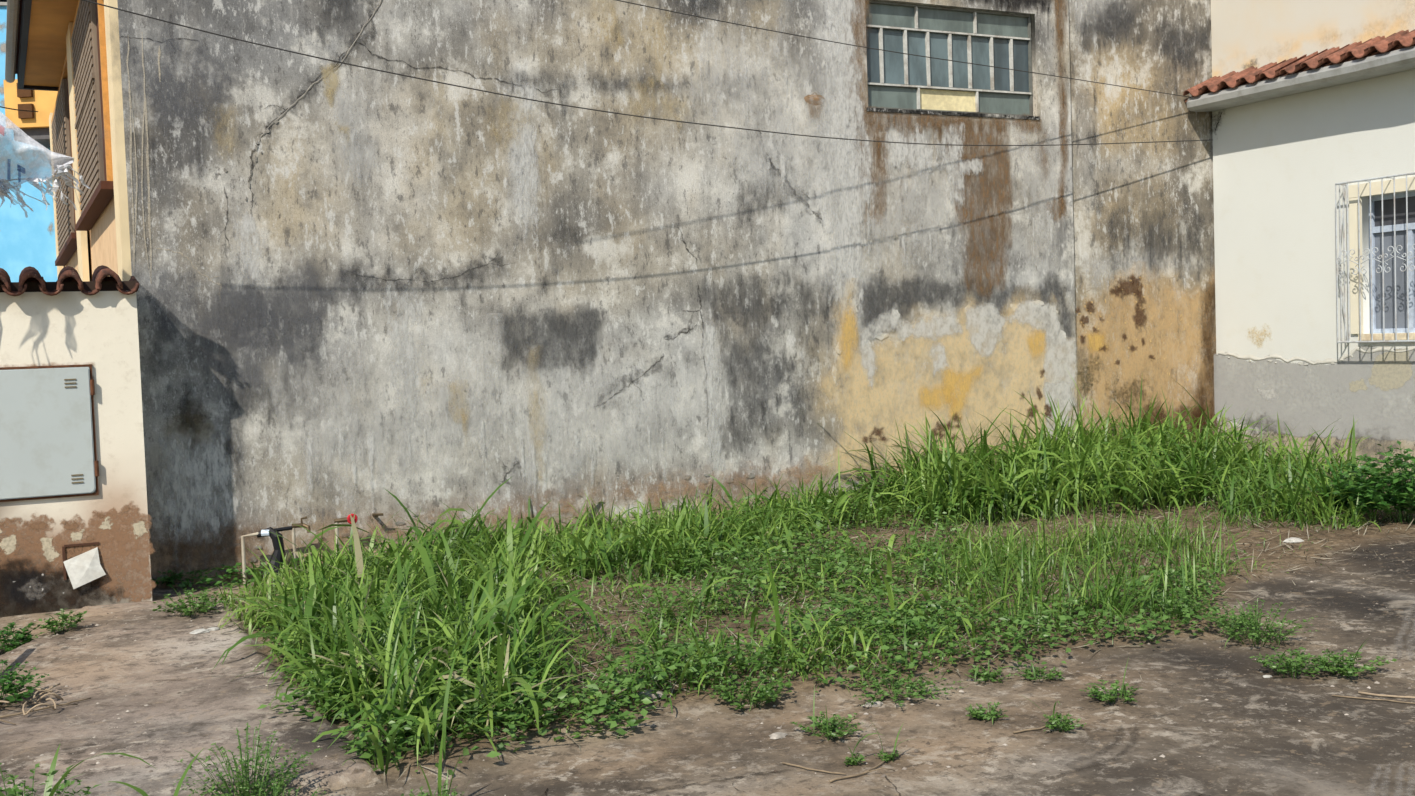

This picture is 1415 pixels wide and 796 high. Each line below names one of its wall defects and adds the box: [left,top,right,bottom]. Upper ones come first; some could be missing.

peeling [646,275,1415,508]